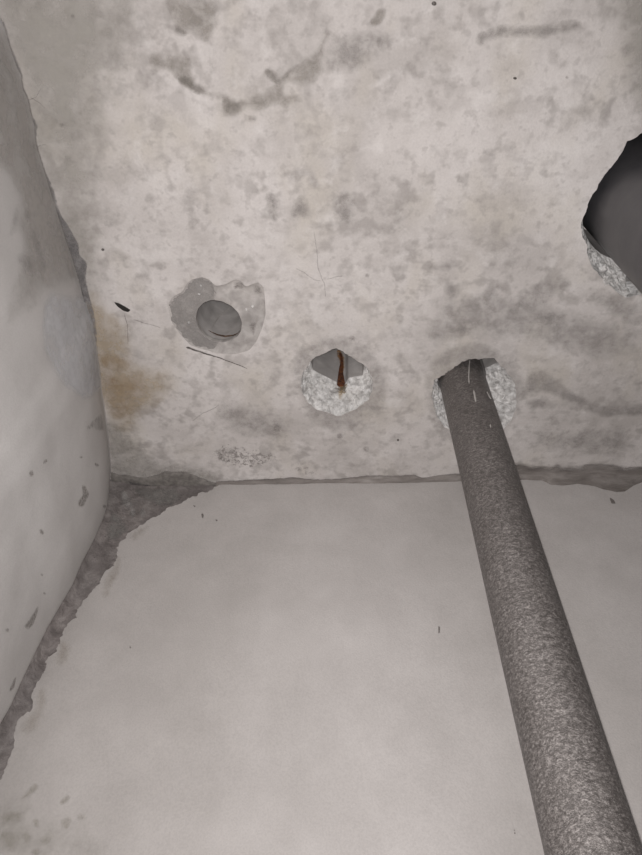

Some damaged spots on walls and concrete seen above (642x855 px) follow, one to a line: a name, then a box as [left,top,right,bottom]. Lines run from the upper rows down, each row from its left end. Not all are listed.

spalling [581,220,642,298]
spalling [168,277,265,354]
spalling [301,348,373,416]
rust [337,350,346,393]
spalling [432,378,450,430]
spalling [480,358,517,429]
peeling [0,471,216,780]